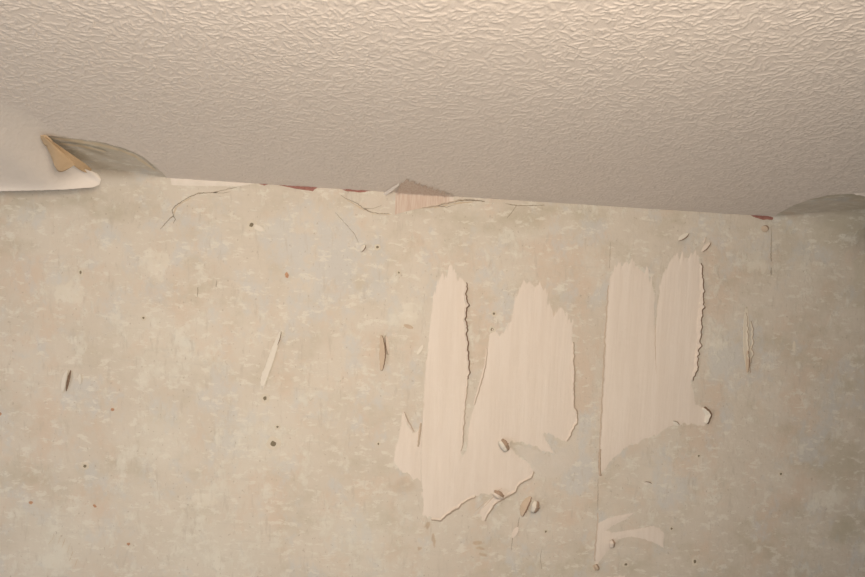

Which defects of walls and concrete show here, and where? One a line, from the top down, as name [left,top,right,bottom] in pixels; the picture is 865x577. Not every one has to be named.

peeling [0,99,256,191]
peeling [777,192,865,215]
peeling [260,331,281,404]
peeling [391,262,581,549]
peeling [596,233,712,479]
peeling [592,510,674,571]